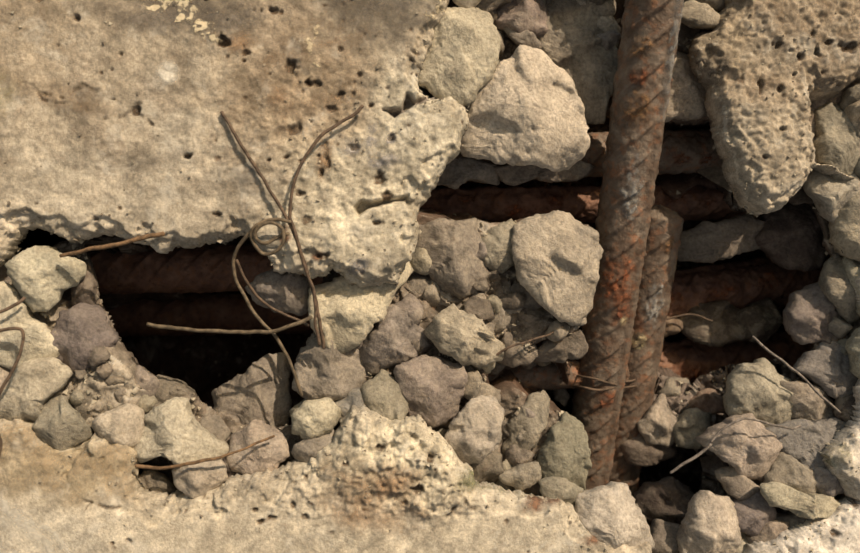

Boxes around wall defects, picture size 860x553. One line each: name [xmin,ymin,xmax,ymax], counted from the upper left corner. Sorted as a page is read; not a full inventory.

damp [115,0,256,29]
peeling [143,0,230,48]
peeling [305,24,320,68]
spalling [809,76,860,141]
spalling [373,0,844,498]
spalling [828,315,860,355]
spalling [0,226,579,517]
spalling [744,379,860,553]